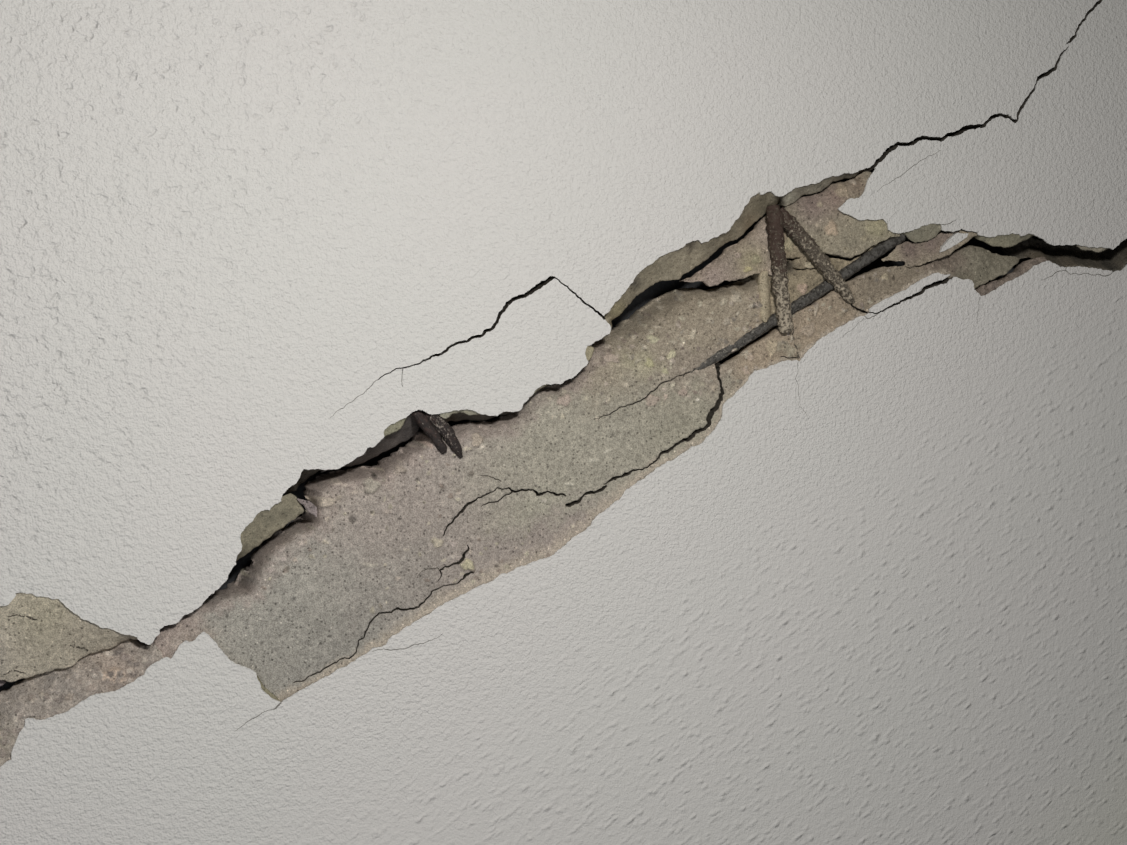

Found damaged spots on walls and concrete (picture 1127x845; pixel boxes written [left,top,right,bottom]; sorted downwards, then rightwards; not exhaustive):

crack [866,0,1102,191]
crack [825,241,882,261]
crack [1000,237,1127,280]
crack [330,276,606,418]
crack [781,324,807,415]
crack [843,277,953,337]
spalling [0,168,1051,766]